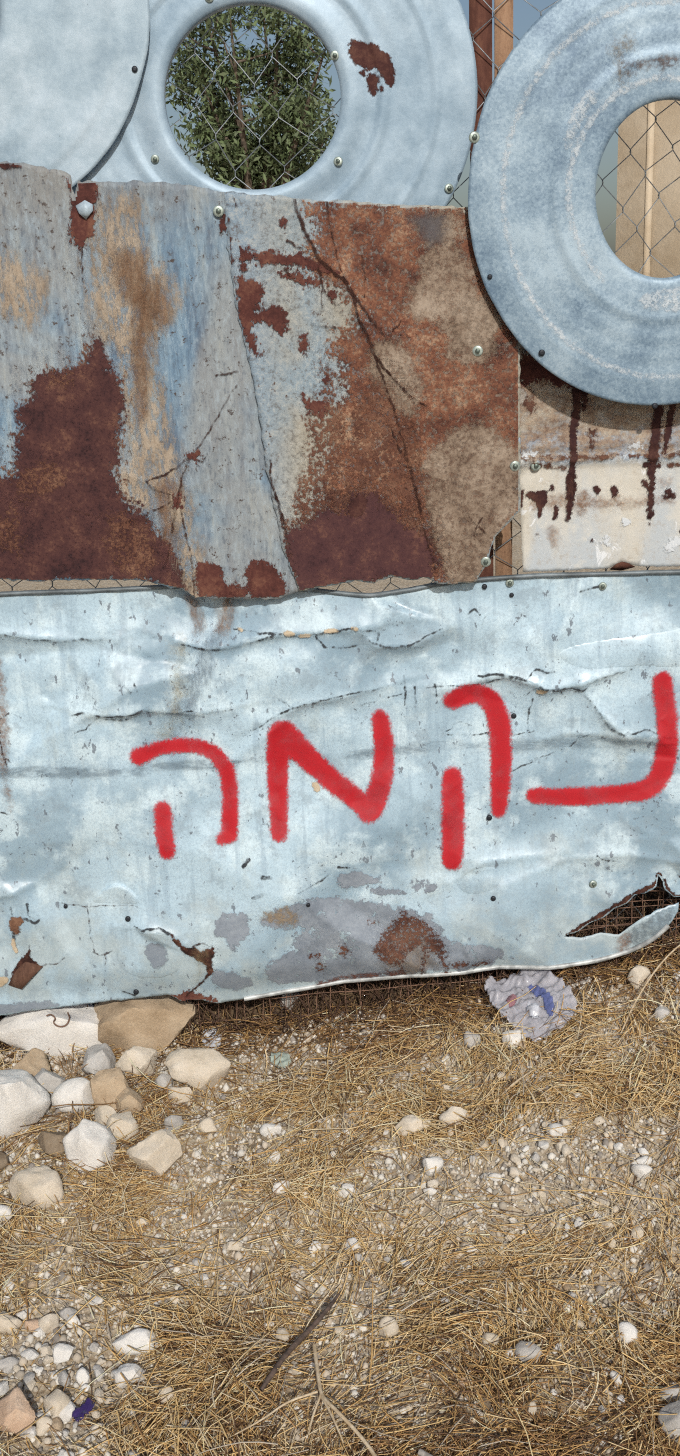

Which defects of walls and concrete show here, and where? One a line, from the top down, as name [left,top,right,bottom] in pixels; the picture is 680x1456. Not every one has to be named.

corrosion [347,38,396,96]
corrosion [0,200,680,630]
crack [283,199,436,570]
corrosion [308,911,493,985]